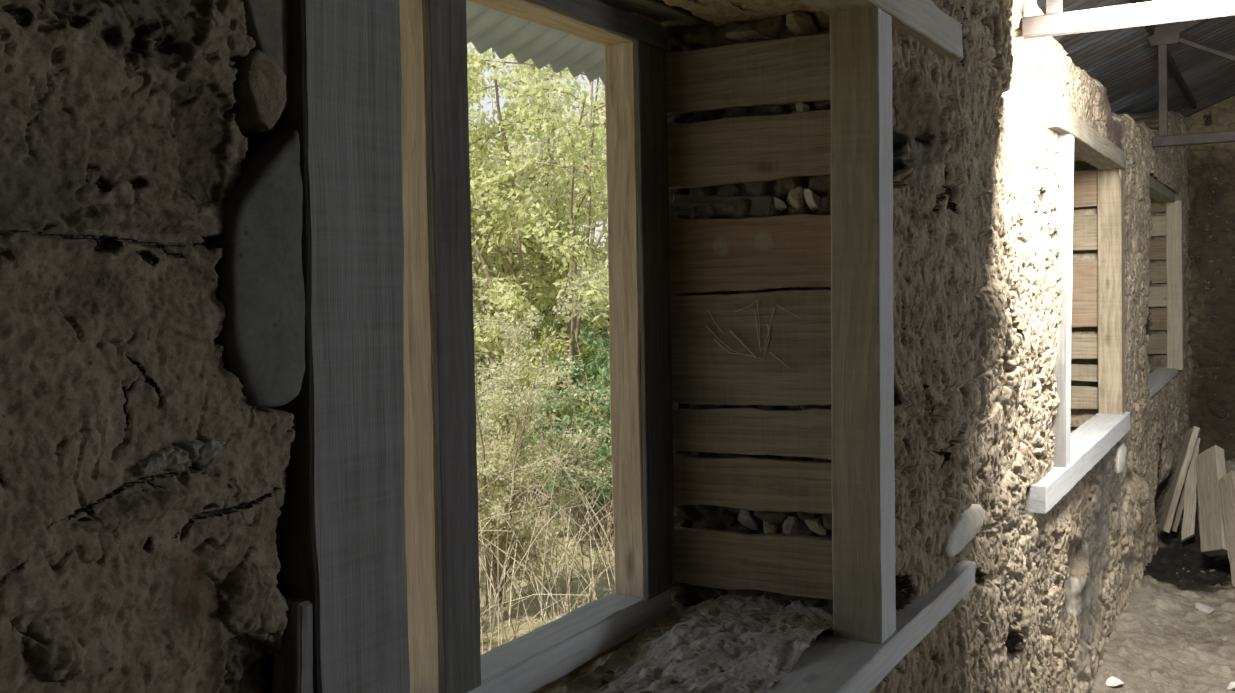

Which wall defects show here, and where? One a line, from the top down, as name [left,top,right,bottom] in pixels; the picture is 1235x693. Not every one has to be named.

crack [8,223,219,258]
crack [122,355,161,428]
crack [49,472,282,552]